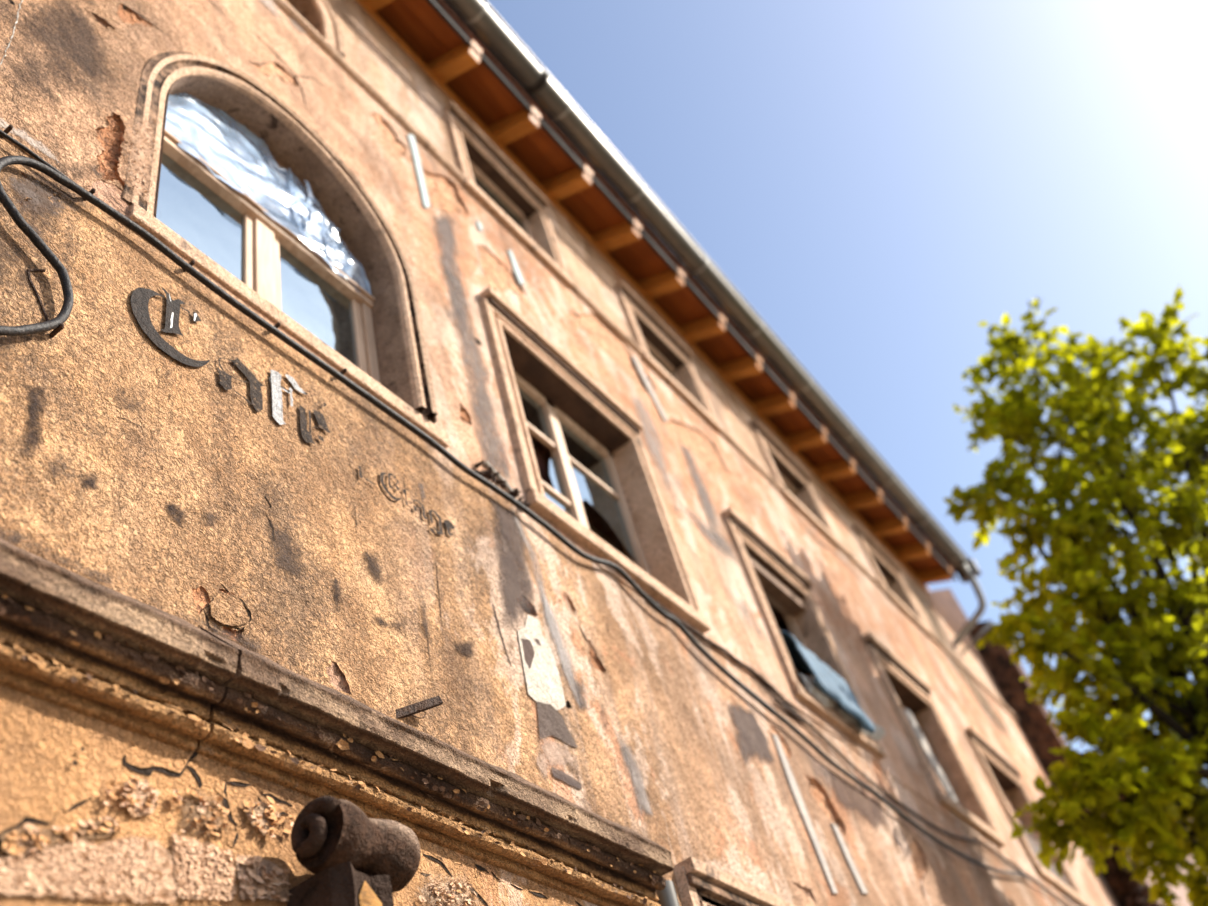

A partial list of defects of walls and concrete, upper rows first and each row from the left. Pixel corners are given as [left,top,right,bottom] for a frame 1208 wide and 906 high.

spalling [84,112,158,217]
peeling [0,637,99,687]
peeling [112,684,207,727]
crack [203,583,257,641]
spalling [321,659,352,694]
leakage [493,501,585,707]
peeling [518,607,572,710]
spalling [582,634,607,675]
leakage [729,704,774,762]
peeling [0,776,296,905]
crack [123,749,294,848]
peeling [223,712,658,906]